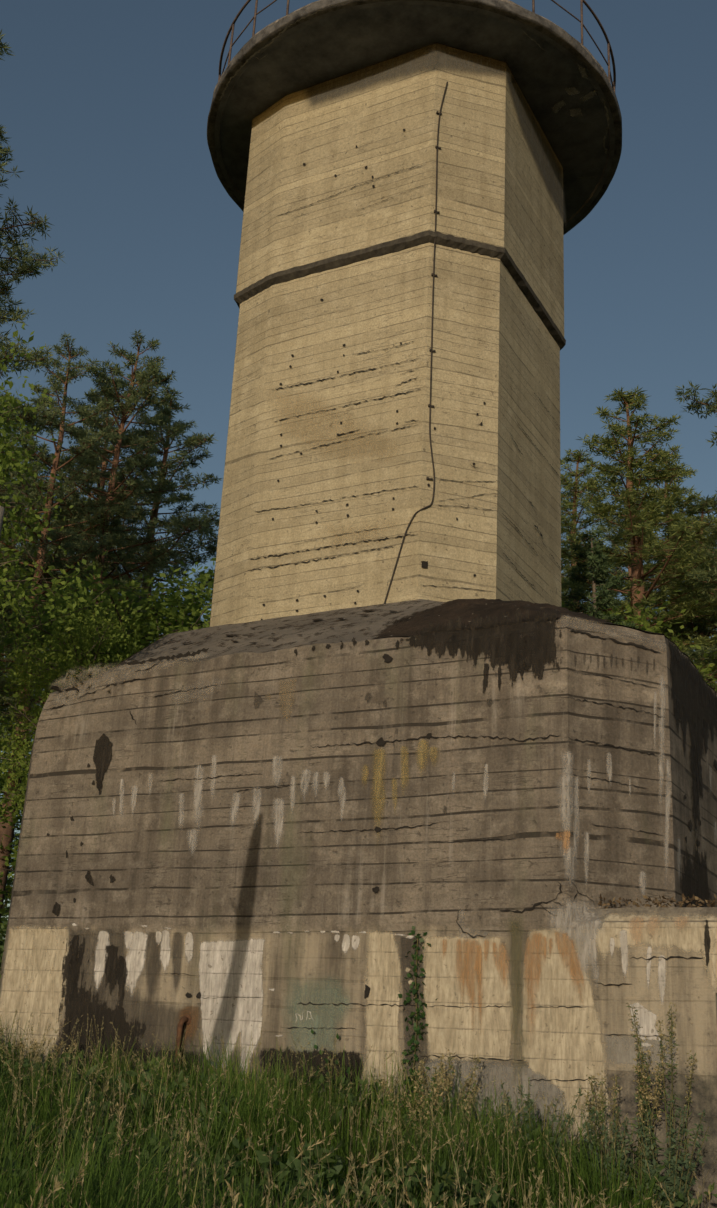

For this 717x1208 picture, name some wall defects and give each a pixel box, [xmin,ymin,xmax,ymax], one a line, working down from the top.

water stain [180,757,216,810]
water stain [275,770,345,839]
water stain [555,636,717,1002]
water stain [70,929,199,1080]
water stain [260,1047,363,1092]